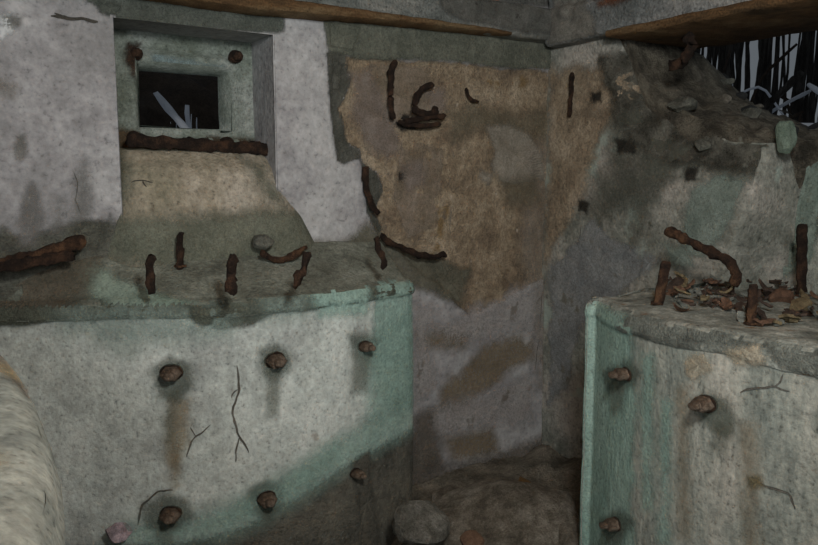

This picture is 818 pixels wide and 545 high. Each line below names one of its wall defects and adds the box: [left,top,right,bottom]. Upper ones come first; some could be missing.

corrosion [119,129,268,156]
spalling [327,23,818,406]
corrosion [0,235,87,272]
crack [231,367,249,462]
crack [186,425,210,457]